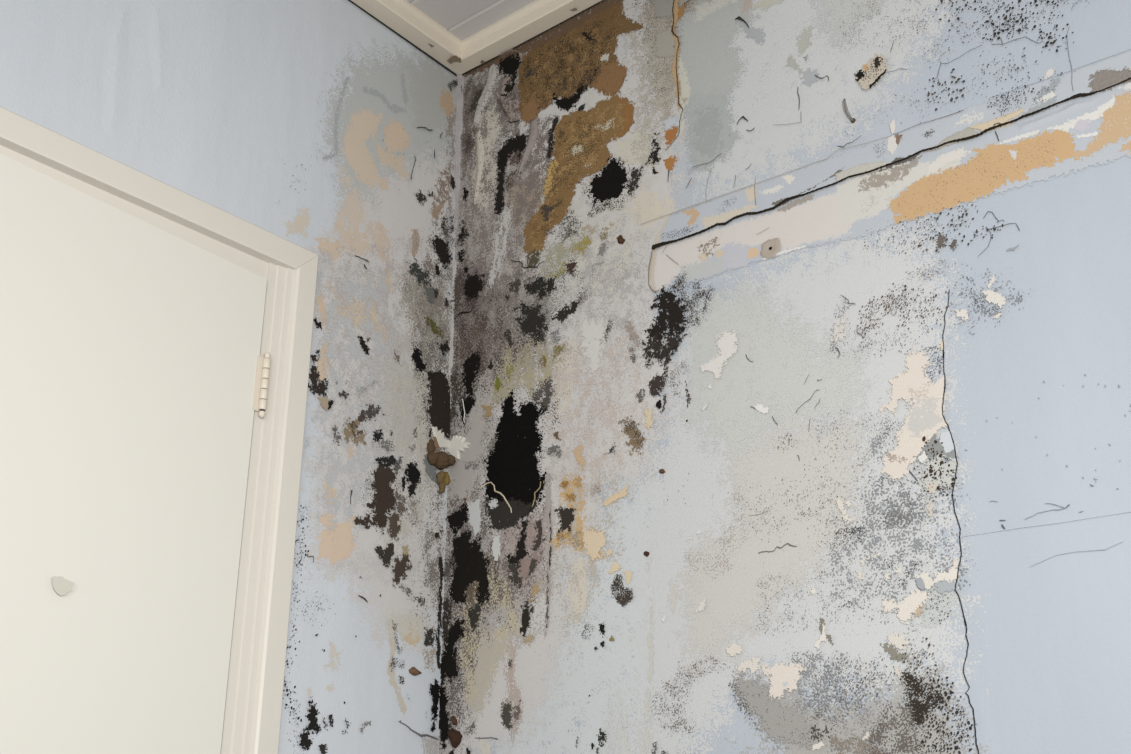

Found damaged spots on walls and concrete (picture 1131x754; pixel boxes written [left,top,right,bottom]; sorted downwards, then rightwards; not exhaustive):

crack [411,127,443,180]
crack [349,0,604,76]
flaking render [517,1,643,254]
crack [642,0,1131,292]
flaking render [759,66,1131,213]
damp [283,0,1082,754]
flaking render [912,431,960,499]
crack [942,289,979,754]